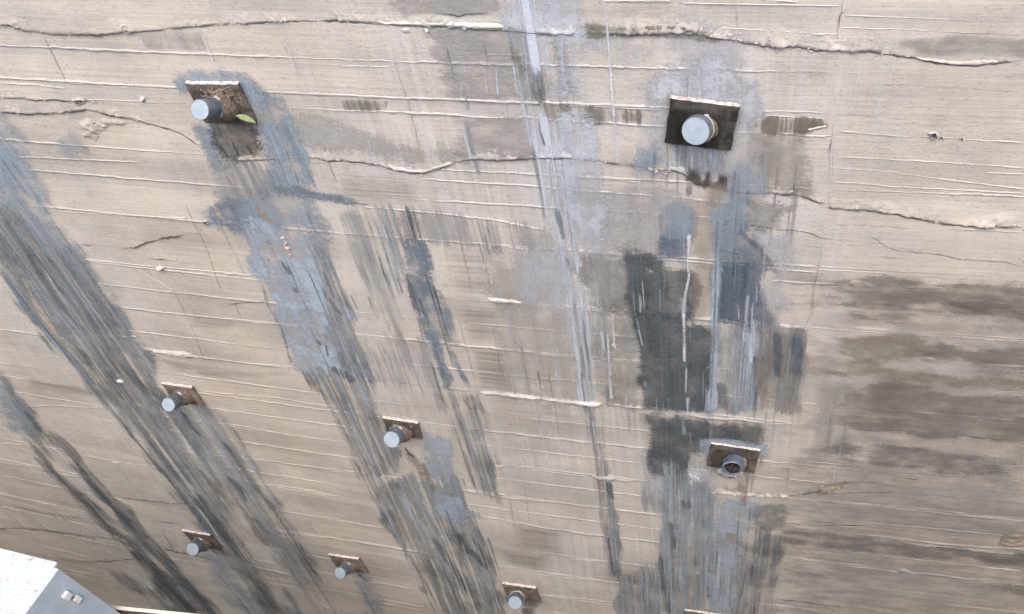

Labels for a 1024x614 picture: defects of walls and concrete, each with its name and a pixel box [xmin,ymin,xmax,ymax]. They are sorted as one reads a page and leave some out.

water stain [0,112,336,614]
water stain [173,70,508,614]
crack [0,7,1016,67]
crack [0,90,1024,266]
water stain [387,0,807,614]